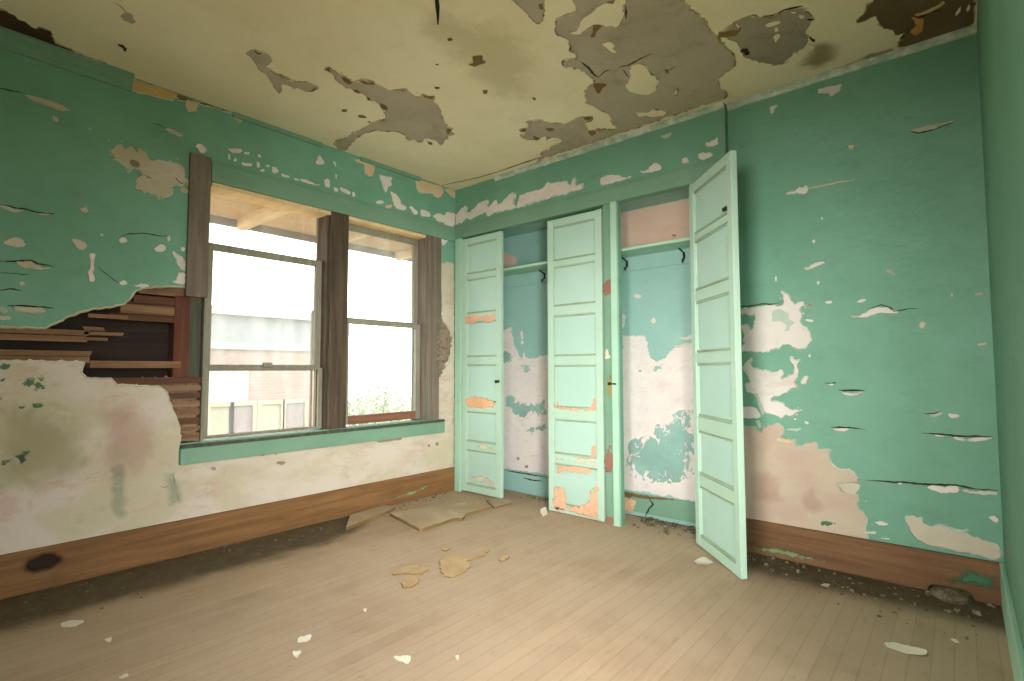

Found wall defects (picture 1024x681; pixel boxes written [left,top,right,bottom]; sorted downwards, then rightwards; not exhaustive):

peeling [856,0,977,48]
peeling [512,0,815,164]
peeling [228,67,584,227]
peeling [621,199,690,249]
peeling [0,233,599,555]
peeling [609,314,695,512]
peeling [740,276,890,539]
crack [828,382,865,396]
crack [832,424,865,432]
crack [925,433,992,442]
crack [868,480,998,495]
peeling [905,515,1004,560]